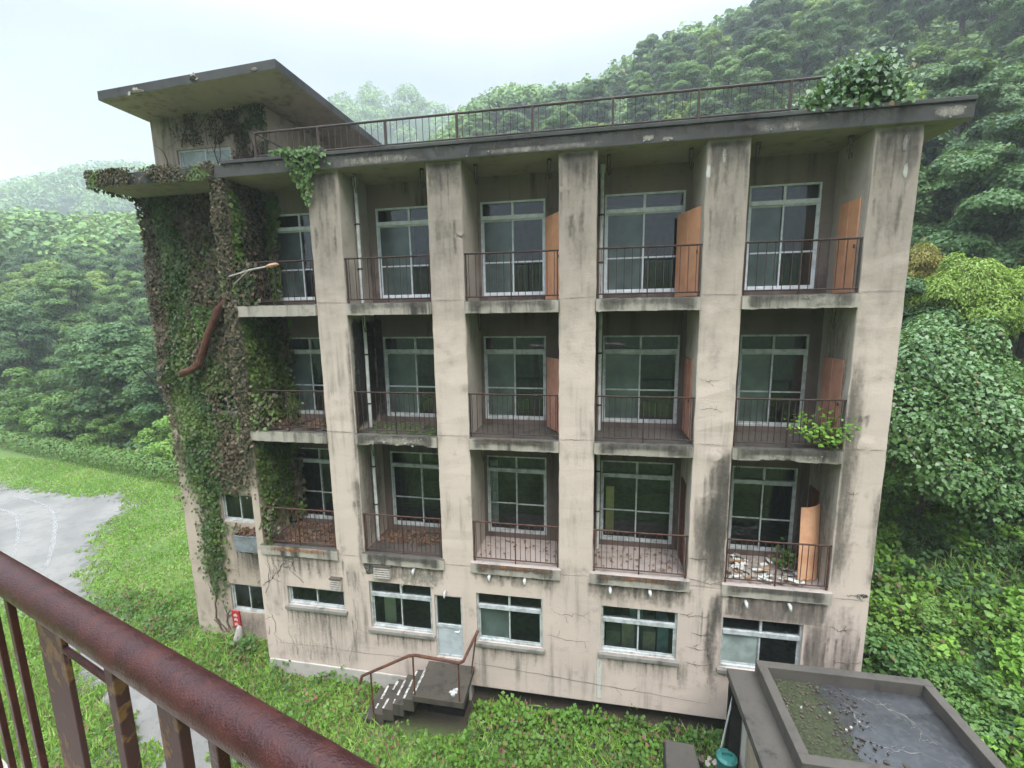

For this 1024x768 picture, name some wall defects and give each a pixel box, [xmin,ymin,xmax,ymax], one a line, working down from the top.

crack [681,614,712,666]
water stain [697,381,868,673]